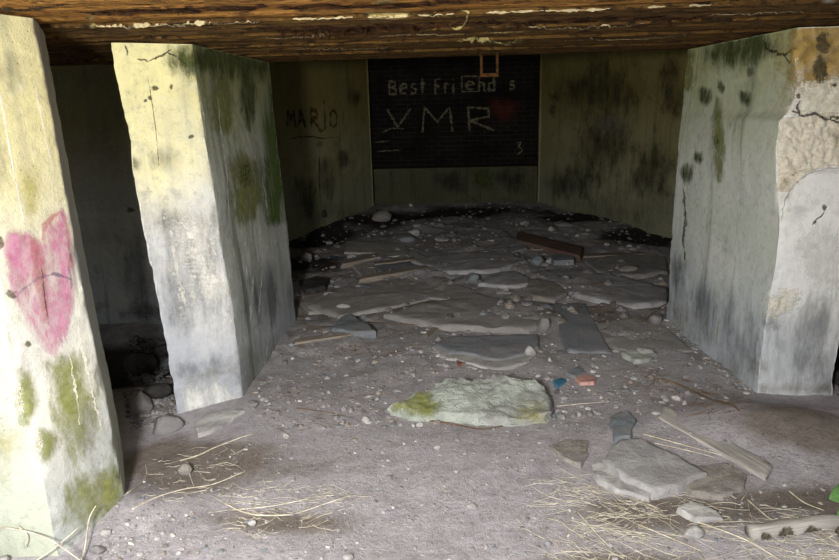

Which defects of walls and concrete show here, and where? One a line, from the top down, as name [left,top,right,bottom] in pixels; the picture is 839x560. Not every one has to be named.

crack [125,46,186,163]
spalling [776,27,839,192]
crack [792,101,839,123]